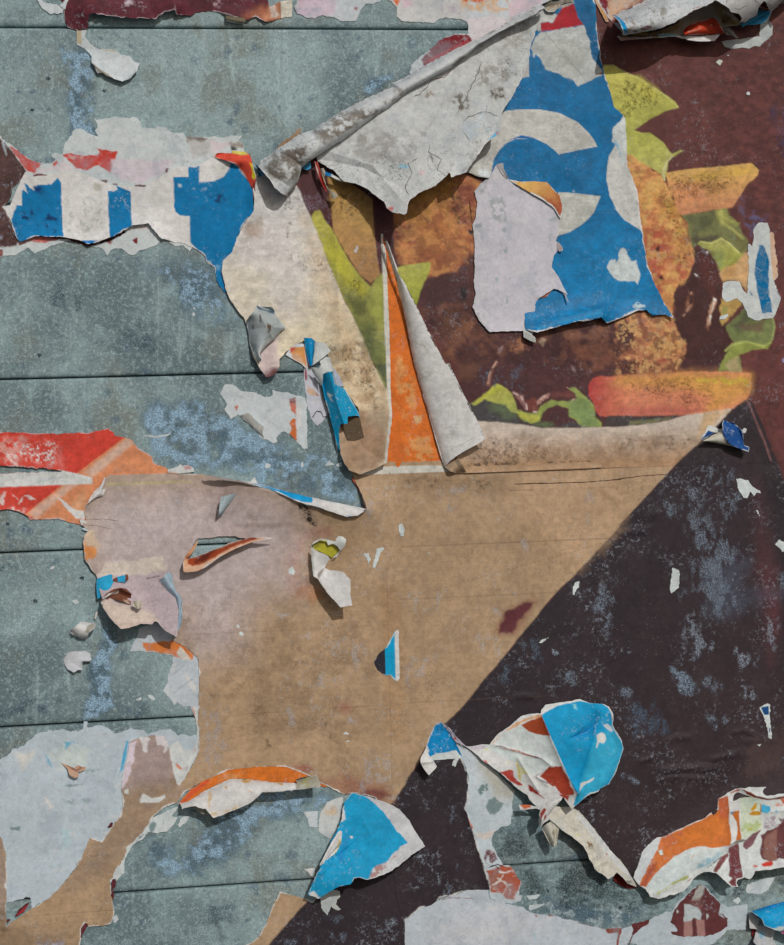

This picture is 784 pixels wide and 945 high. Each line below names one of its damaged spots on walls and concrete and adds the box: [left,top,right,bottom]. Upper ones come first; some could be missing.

peeling [258,5,546,215]
peeling [385,241,486,473]
peeling [205,474,366,520]
peeling [178,775,320,827]
peeling [308,793,425,899]
peeling [466,699,784,904]
peeling [519,890,549,910]
peeling [751,902,784,934]